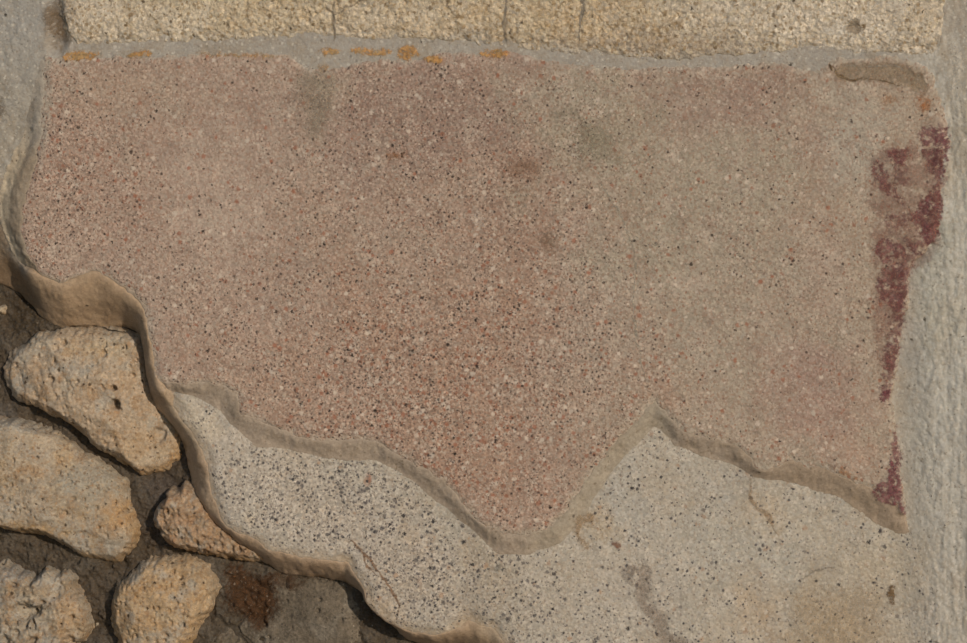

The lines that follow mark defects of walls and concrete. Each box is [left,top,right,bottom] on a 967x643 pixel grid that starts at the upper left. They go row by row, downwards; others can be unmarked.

crack [329,0,362,39]
crack [500,0,508,42]
crack [577,0,585,40]
peeling [871,126,950,315]
spalling [0,57,504,643]
peeling [158,378,942,643]